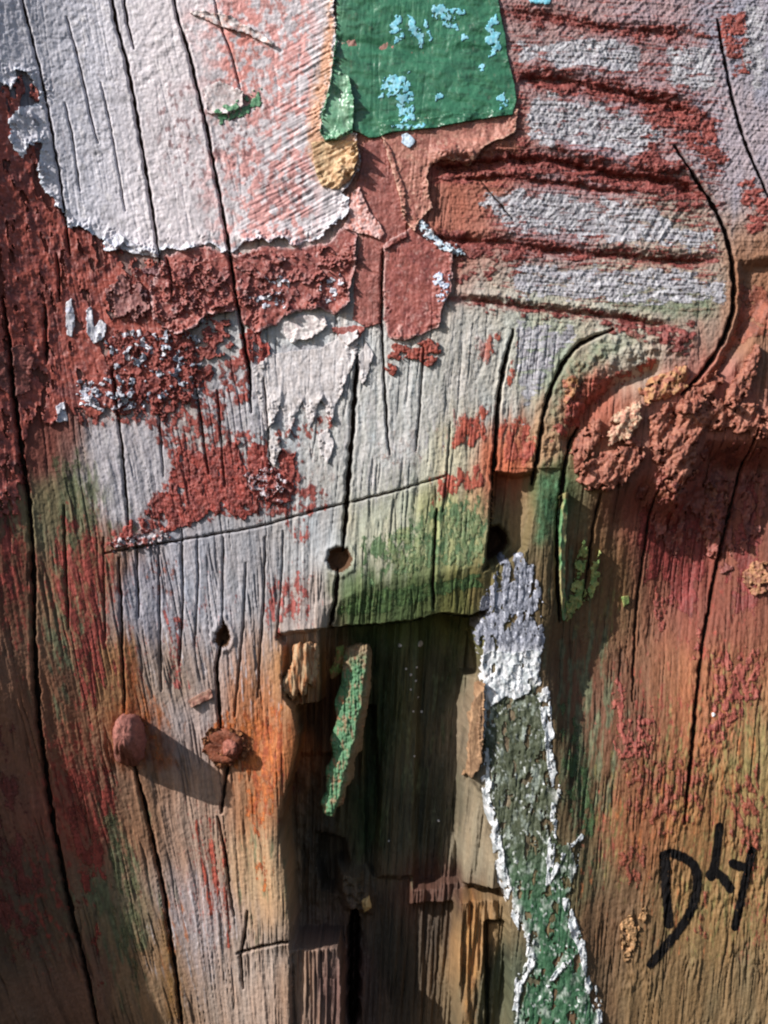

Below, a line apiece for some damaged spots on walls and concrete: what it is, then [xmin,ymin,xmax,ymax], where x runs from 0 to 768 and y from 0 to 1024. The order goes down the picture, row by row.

peeling [0,0,518,520]
crack [677,153,735,395]
peeling [109,438,296,553]
crack [103,254,451,729]
peeling [557,492,601,621]
crack [684,432,757,822]
crack [135,766,183,1024]
rust [213,700,290,837]
crack [218,767,290,987]
peeling [462,552,603,1024]